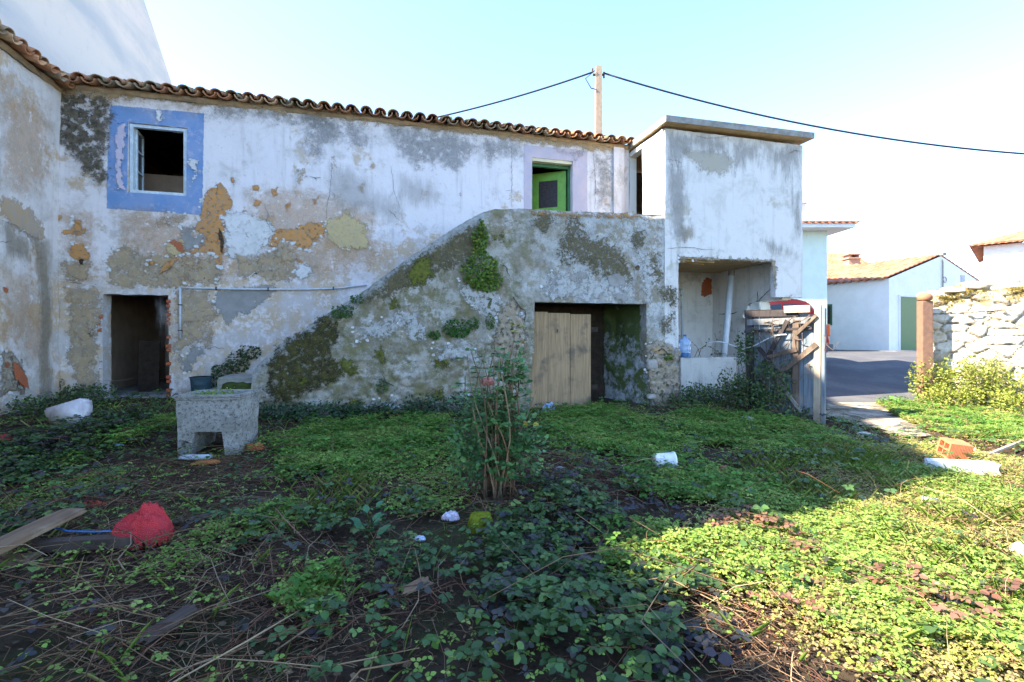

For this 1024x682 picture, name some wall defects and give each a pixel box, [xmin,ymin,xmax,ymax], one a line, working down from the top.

damp [59,84,614,201]
flaking render [58,215,106,393]
flaking render [105,177,379,374]
spalling [677,254,792,321]
flaking render [0,348,29,408]